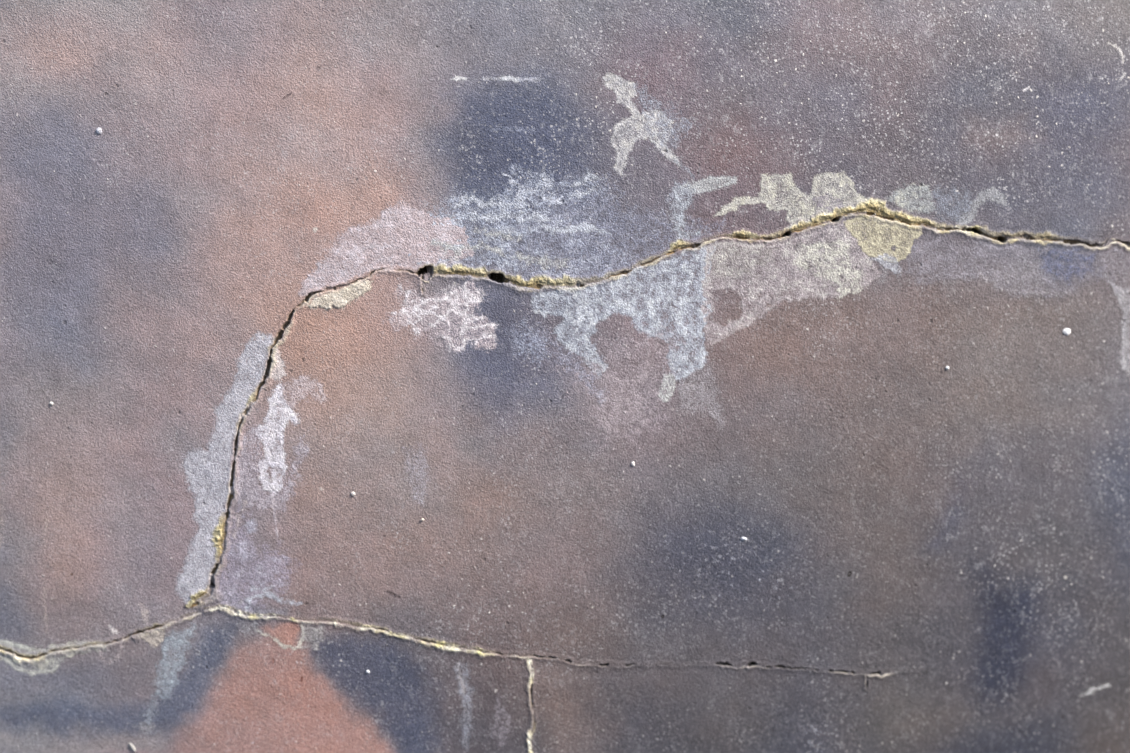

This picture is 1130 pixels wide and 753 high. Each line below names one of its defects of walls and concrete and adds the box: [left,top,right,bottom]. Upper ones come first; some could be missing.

leakage [298,72,1130,461]
leakage [172,329,330,651]
crack [0,191,1130,753]